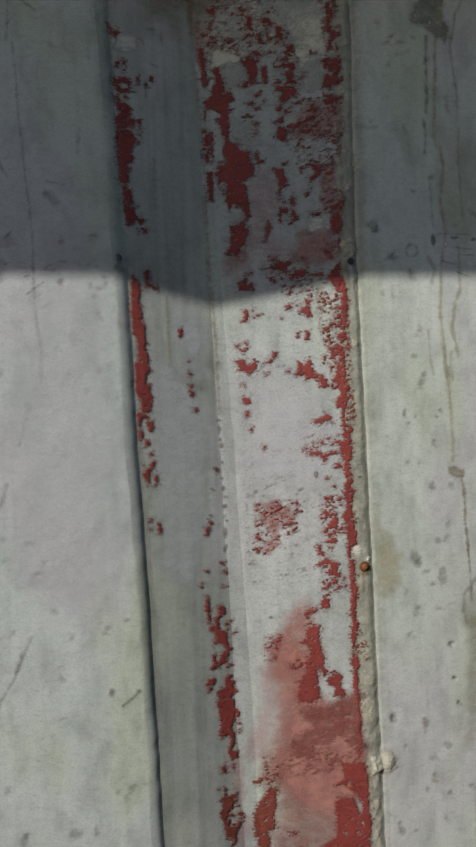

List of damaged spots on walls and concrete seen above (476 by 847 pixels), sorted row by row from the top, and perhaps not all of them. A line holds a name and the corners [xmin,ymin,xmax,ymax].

peeling [110,57,153,234]
peeling [127,266,159,487]
peeling [196,0,372,847]